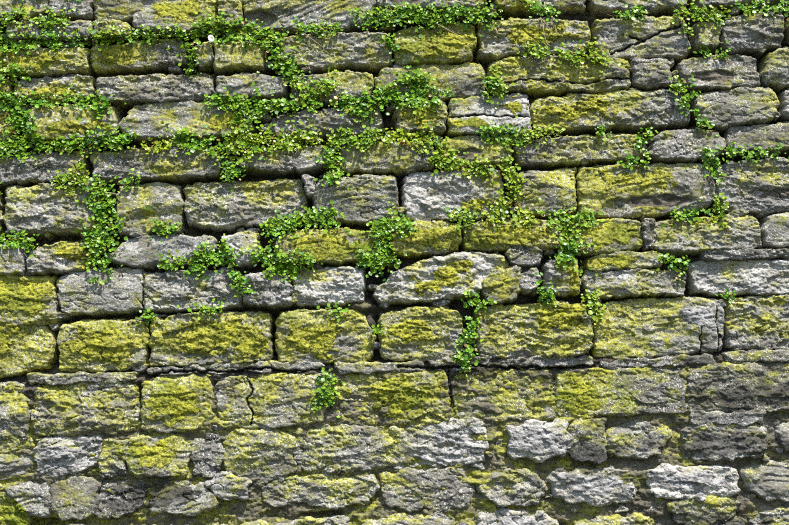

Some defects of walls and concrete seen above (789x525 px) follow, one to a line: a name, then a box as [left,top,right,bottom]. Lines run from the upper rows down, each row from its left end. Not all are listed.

crack [148,367,326,424]